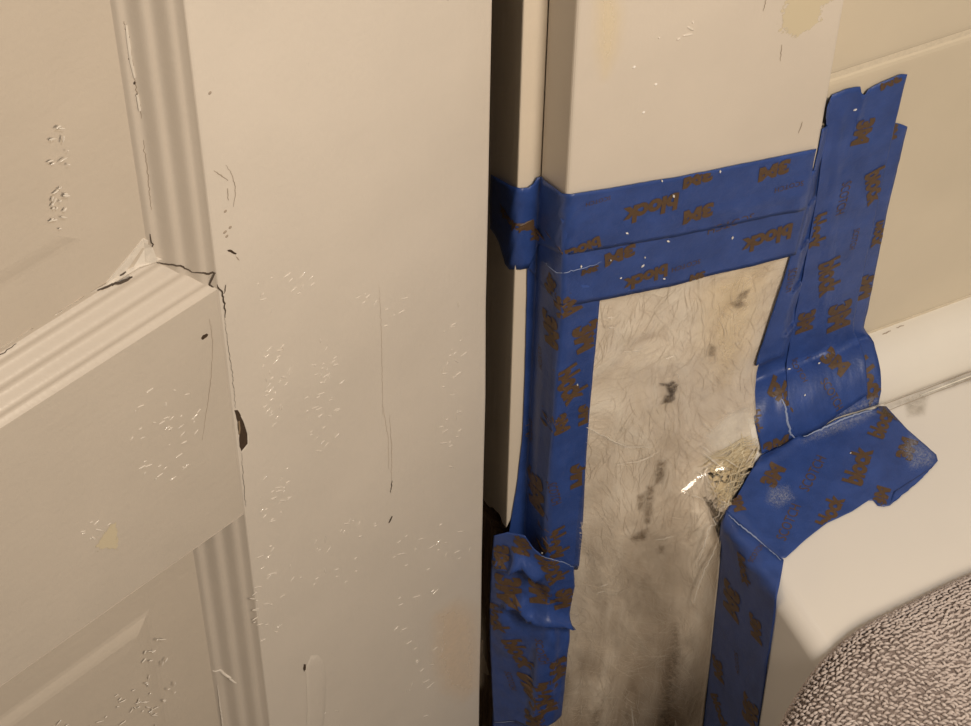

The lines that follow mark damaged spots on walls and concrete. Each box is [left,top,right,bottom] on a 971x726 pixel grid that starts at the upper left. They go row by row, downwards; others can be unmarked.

crack [125,27,152,210]
crack [150,234,236,440]
peeling [234,410,249,452]